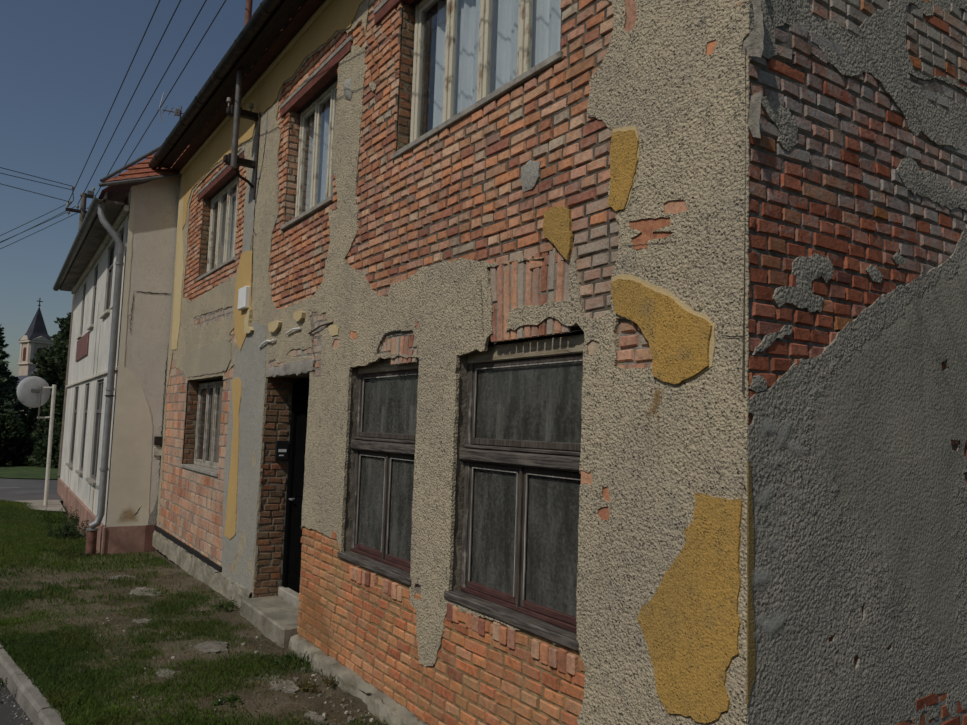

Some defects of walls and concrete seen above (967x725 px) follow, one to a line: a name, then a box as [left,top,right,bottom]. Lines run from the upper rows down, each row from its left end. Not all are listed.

spalling [148,0,715,598]
spalling [737,0,967,399]
spalling [297,526,586,725]
peeling [637,461,756,723]
spalling [896,692,967,725]